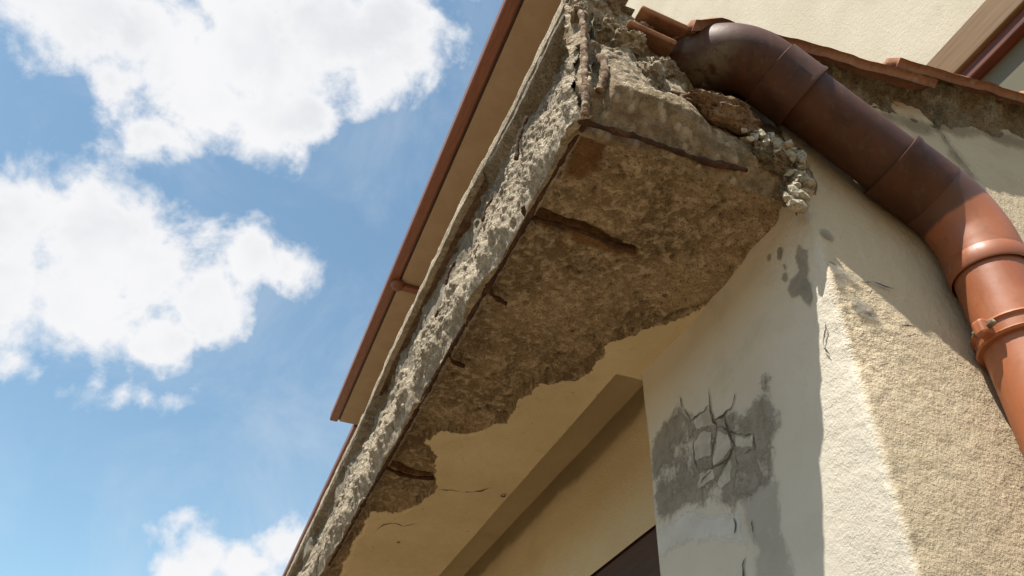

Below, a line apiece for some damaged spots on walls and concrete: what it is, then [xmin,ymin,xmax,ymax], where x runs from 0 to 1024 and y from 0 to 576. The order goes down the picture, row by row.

corrosion [567,136,605,177]
corrosion [536,207,637,257]
spalling [298,0,818,576]
crack [679,392,755,489]